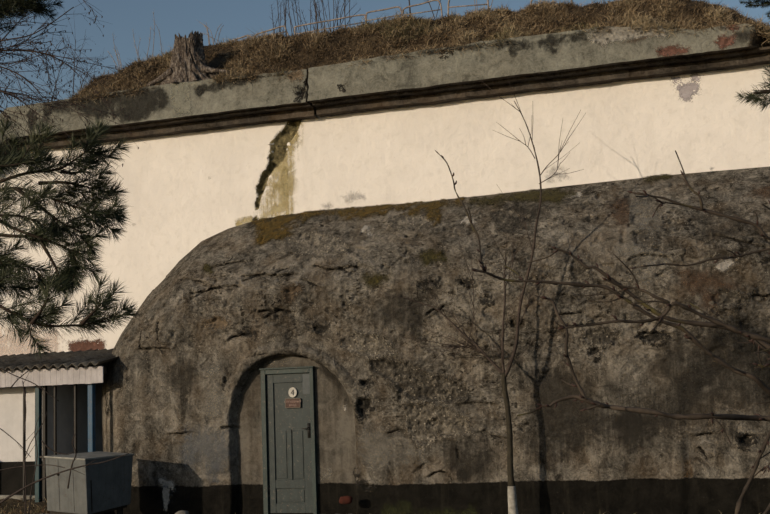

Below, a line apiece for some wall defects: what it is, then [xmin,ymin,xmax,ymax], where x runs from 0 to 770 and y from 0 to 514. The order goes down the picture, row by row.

spalling [588,26,689,57]
damp [27,74,257,131]
crack [252,120,302,221]
damp [259,133,299,219]
crack [186,256,358,297]
damp [525,318,770,469]